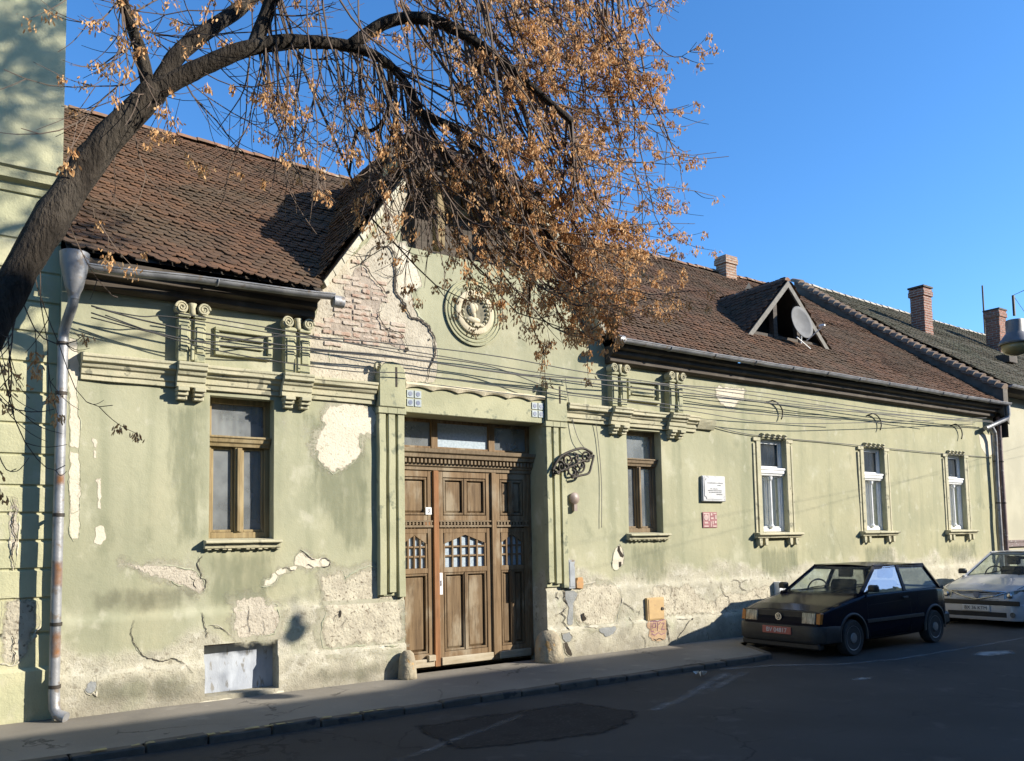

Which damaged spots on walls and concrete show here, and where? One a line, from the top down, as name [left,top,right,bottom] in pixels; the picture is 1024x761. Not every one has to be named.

flaking render [309,188,438,383]
peeling [67,337,98,542]
peeling [308,401,376,475]
peeling [94,525,106,545]
crack [130,623,193,673]
flaking render [118,559,208,595]
flaking render [225,550,406,660]
flaking render [561,545,625,657]